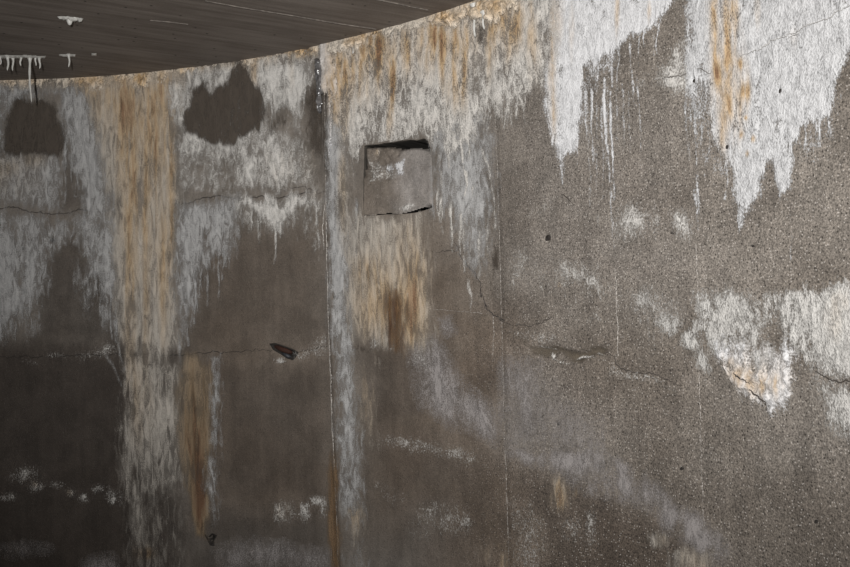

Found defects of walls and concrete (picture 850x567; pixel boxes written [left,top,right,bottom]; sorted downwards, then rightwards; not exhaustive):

water stain [659,0,850,231]
crack [0,206,113,215]
water stain [0,0,672,539]
rust [386,290,404,349]
water stain [501,364,727,567]
water stain [637,278,850,441]
crack [733,373,767,405]